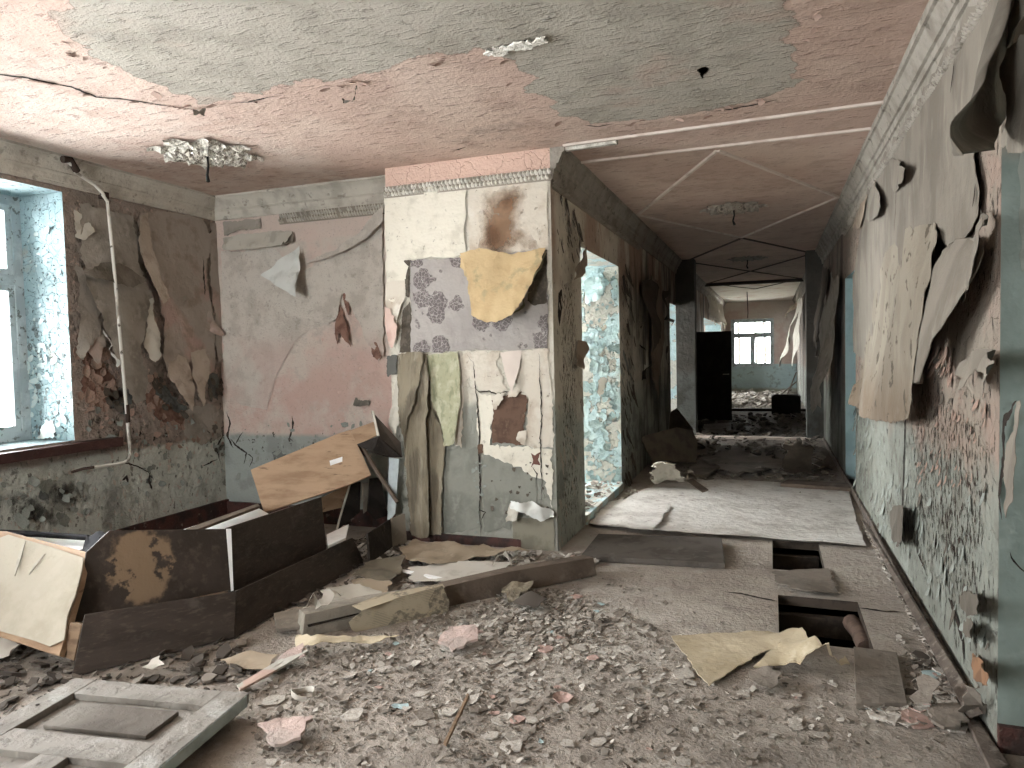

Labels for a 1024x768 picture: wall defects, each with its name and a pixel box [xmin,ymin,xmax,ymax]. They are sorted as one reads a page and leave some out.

crack [0,74,197,110]
peeling [48,0,822,127]
peeling [74,210,95,240]
peeling [222,206,383,297]
peeling [853,181,881,229]
peeling [888,158,905,192]
peeling [26,303,226,504]
crack [204,403,253,466]
peeling [238,408,366,464]
peeling [442,195,638,550]
peeling [852,325,990,650]